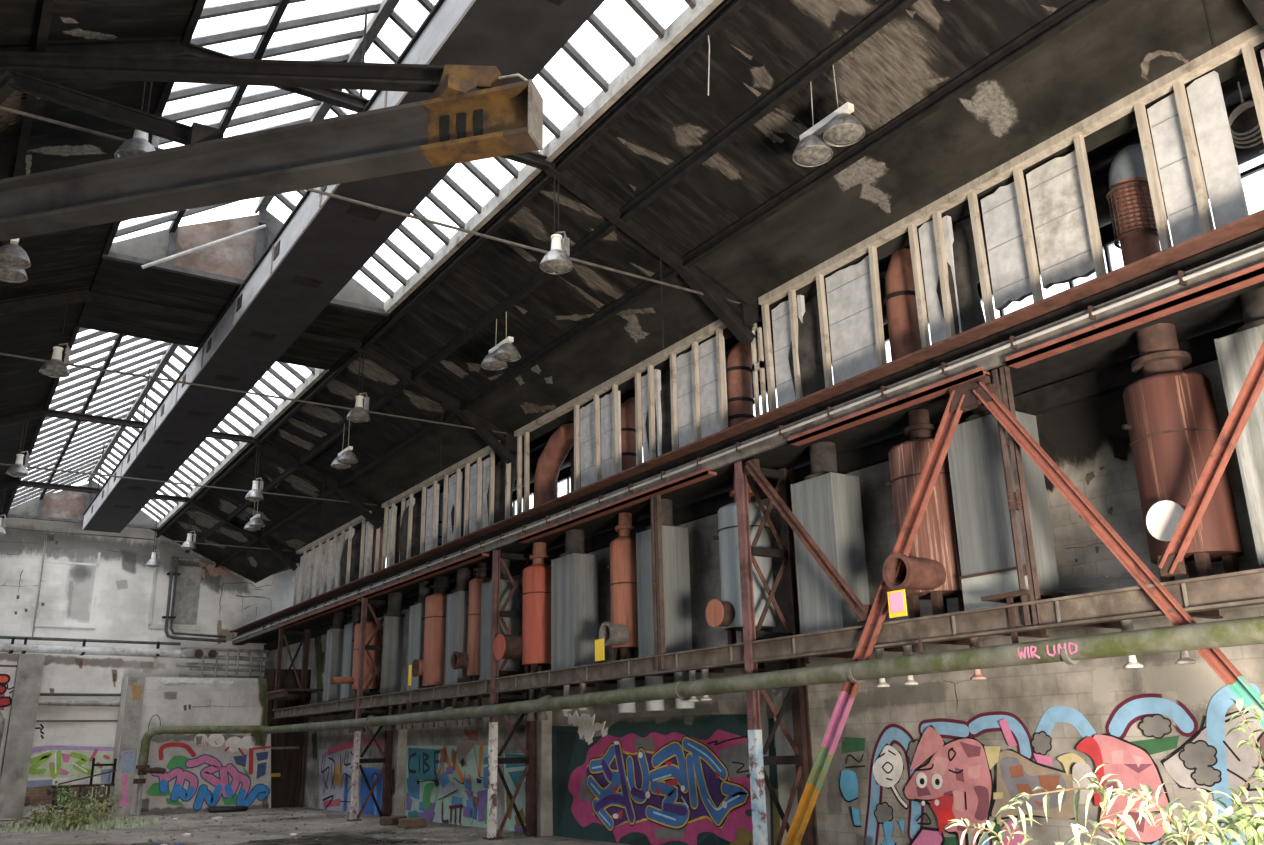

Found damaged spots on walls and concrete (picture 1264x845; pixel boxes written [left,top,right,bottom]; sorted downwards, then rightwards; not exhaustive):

peeling [791,0,874,38]
peeling [730,44,773,97]
peeling [829,0,950,129]
peeling [959,81,1017,137]
peeling [616,123,742,180]
peeling [834,157,891,213]
peeling [540,190,618,241]
peeling [555,262,655,342]